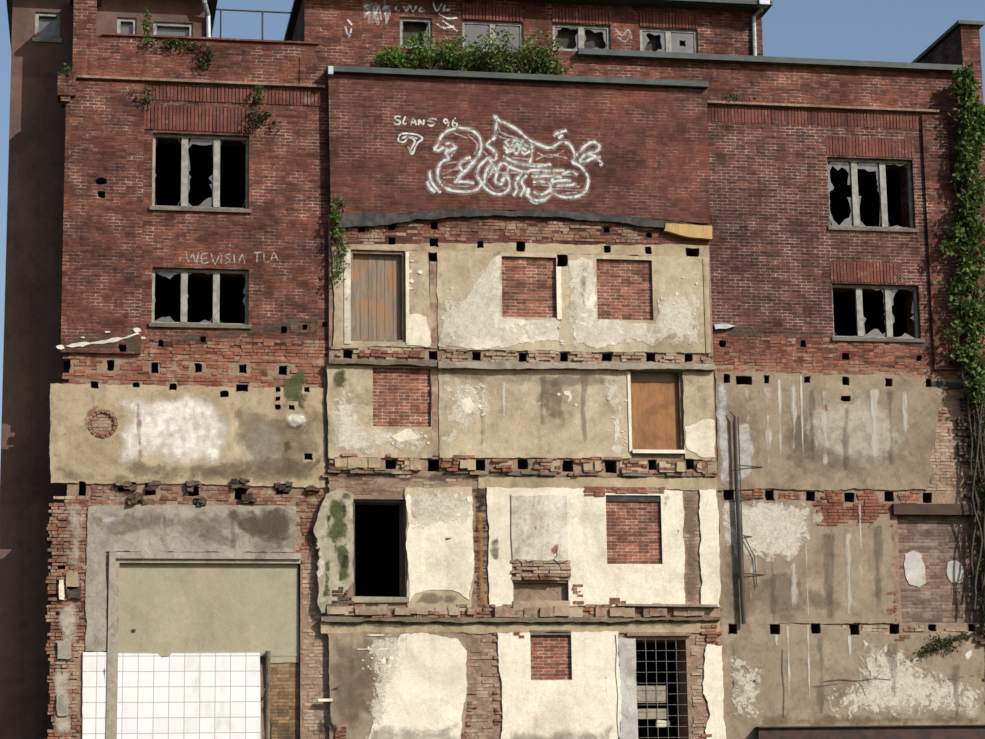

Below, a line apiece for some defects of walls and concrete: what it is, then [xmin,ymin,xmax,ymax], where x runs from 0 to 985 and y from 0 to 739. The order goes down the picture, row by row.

flaking render [336,219,664,245]
water stain [122,396,301,475]
water stain [287,415,306,426]
flaking render [56,255,974,561]
water stain [778,376,907,464]
water stain [316,532,325,577]
flaking render [570,490,723,739]
peeling [729,658,761,718]
peeling [828,592,979,719]